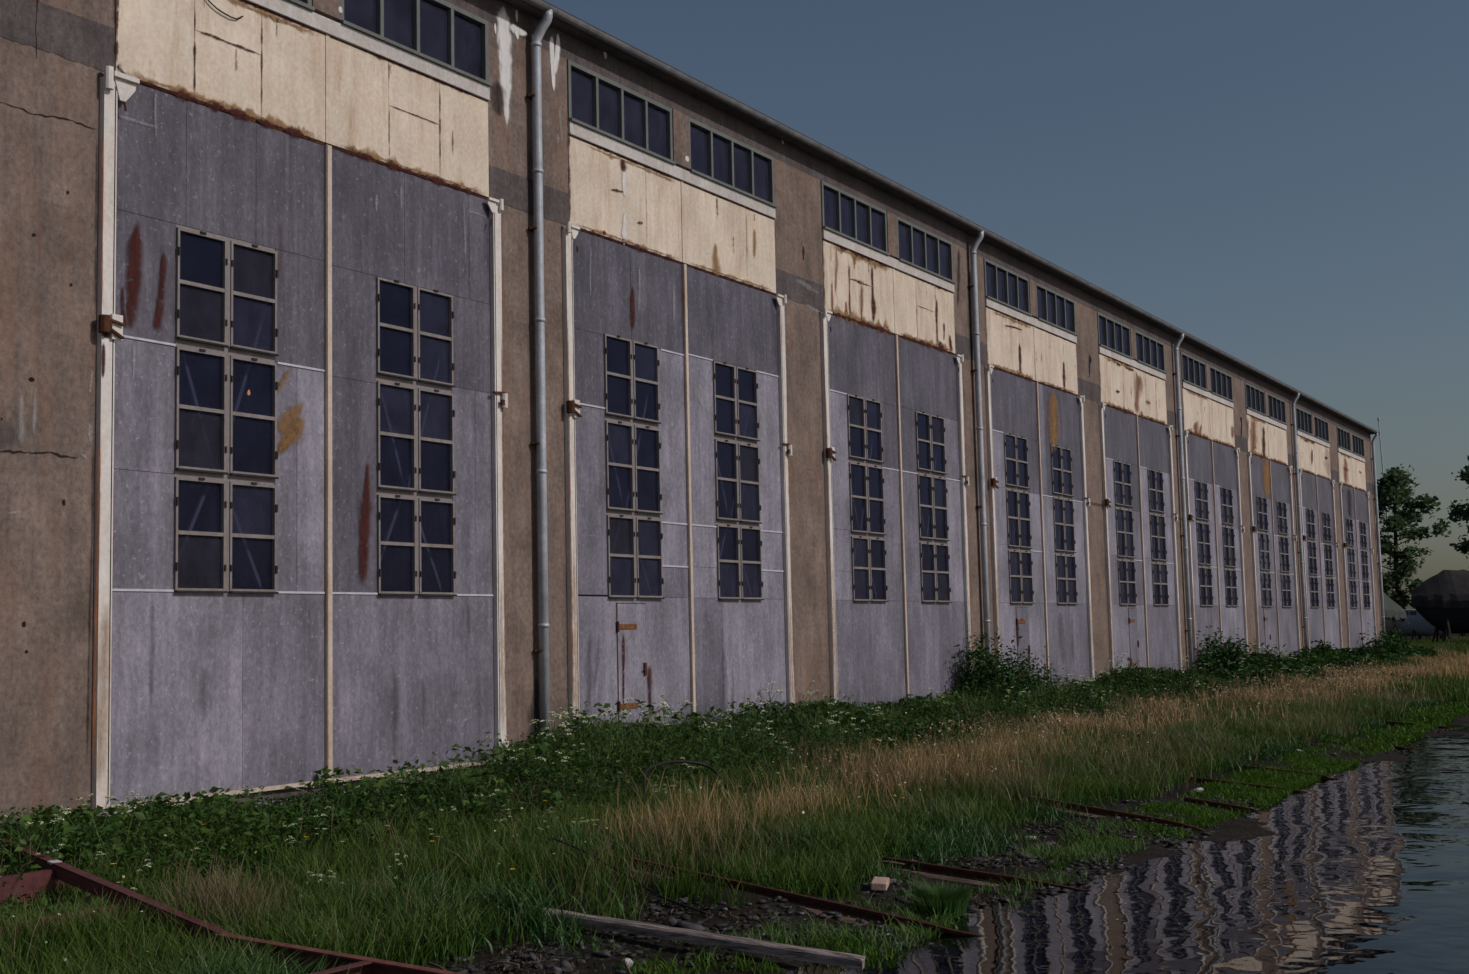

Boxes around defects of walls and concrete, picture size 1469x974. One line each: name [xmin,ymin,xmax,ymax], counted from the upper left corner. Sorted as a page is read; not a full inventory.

crack [0,102,94,129]
rust [115,0,313,139]
rust [342,50,479,194]
peeling [492,83,503,114]
rust [155,253,166,328]
rust [823,239,952,353]
rust [278,404,304,455]
rust [359,464,372,580]